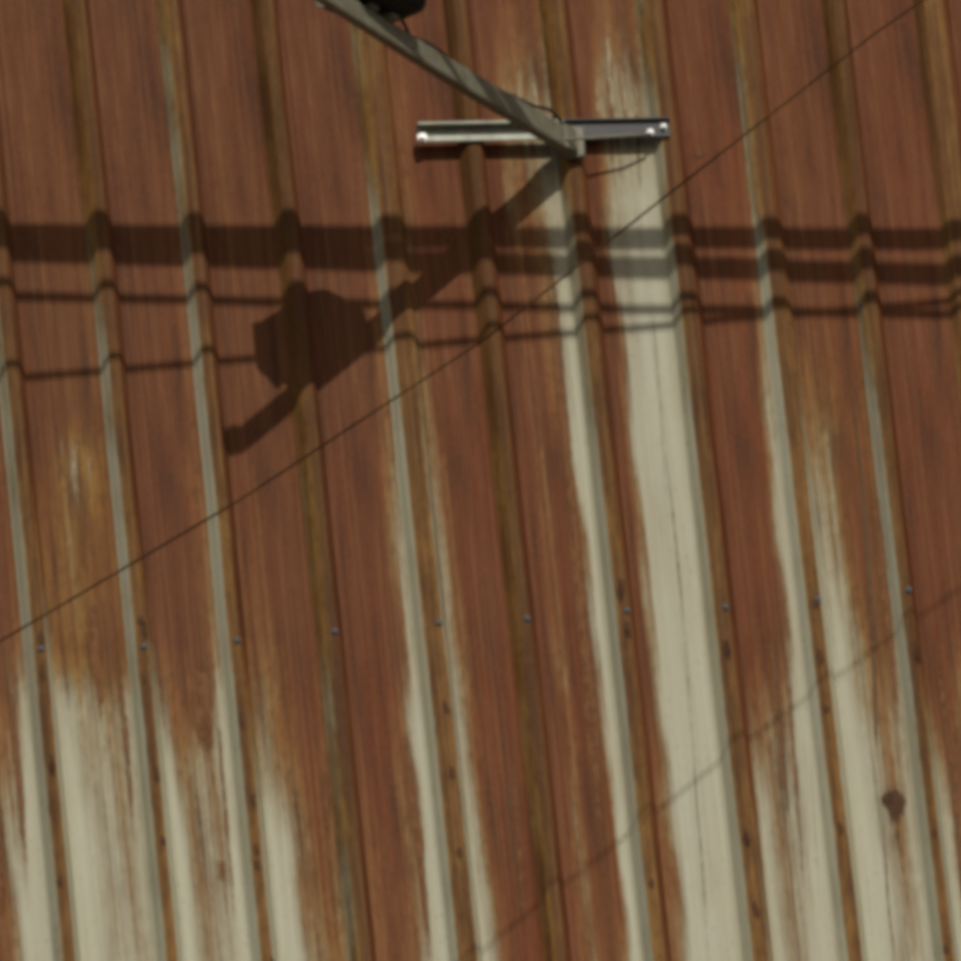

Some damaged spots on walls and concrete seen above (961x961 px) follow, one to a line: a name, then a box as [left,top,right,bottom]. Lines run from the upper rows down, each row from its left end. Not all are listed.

rust [0,0,685,961]
rust [393,0,961,961]